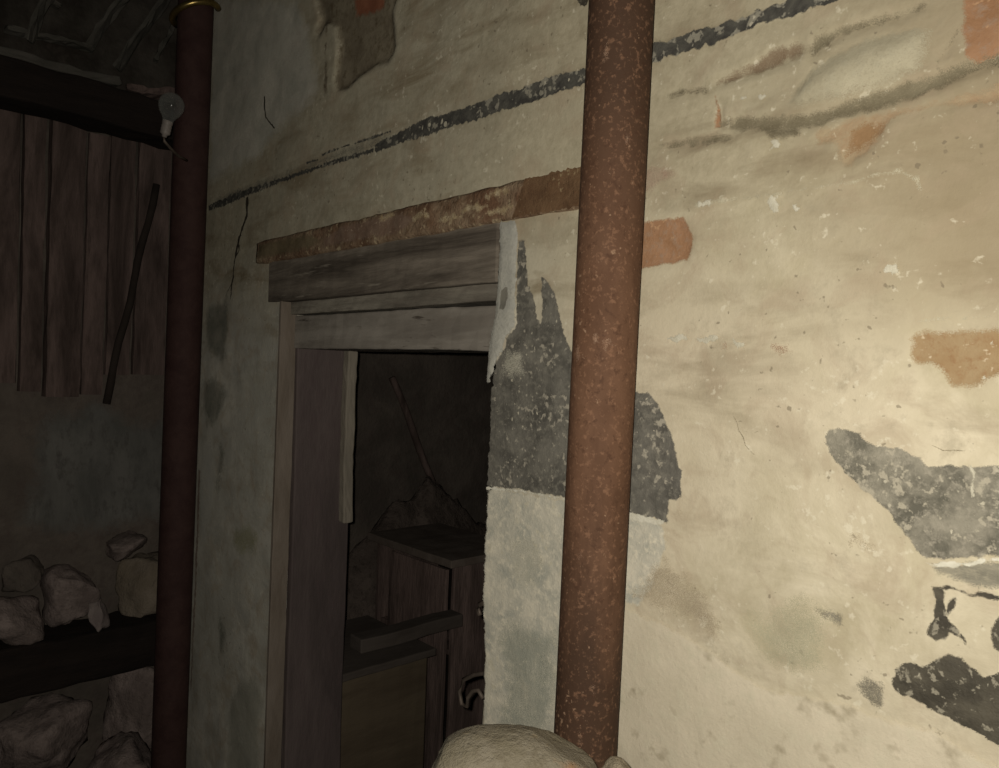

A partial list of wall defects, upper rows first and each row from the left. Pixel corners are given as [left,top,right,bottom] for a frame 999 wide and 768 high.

flaking render [314,0,396,96]
flaking render [960,0,999,65]
flaking render [641,216,694,269]
flaking render [909,316,999,388]
peeling [482,240,572,733]
peeling [625,391,682,607]
peeling [824,427,999,645]
peeling [990,618,999,651]
peeling [856,654,999,745]